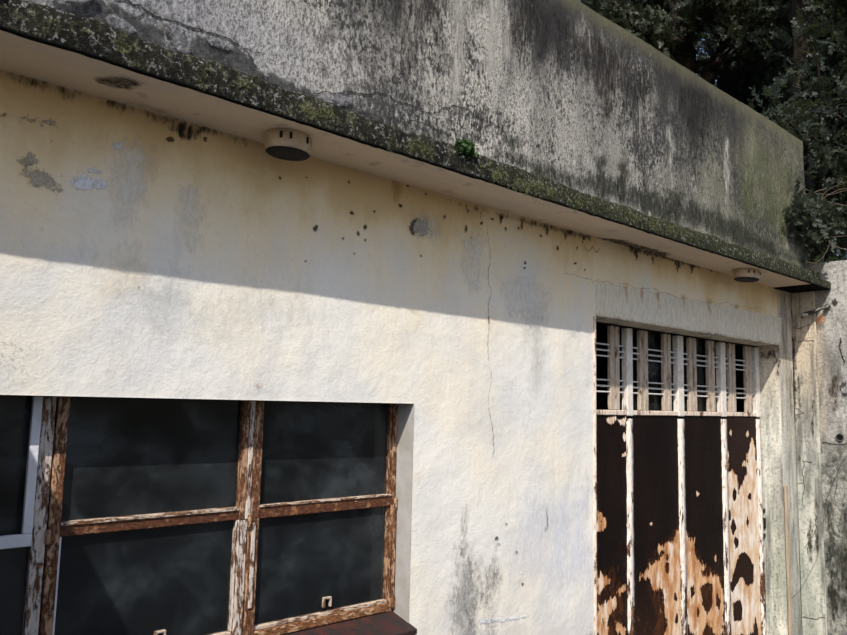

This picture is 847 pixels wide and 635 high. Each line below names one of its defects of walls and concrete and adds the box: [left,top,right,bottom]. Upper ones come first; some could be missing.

leakage [96,77,144,90]
crack [100,0,262,67]
leakage [395,0,464,110]
leakage [485,0,653,134]
leakage [147,113,217,142]
peeling [18,152,62,192]
leakage [617,160,628,195]
leakage [663,129,685,213]
leakage [450,548,501,635]